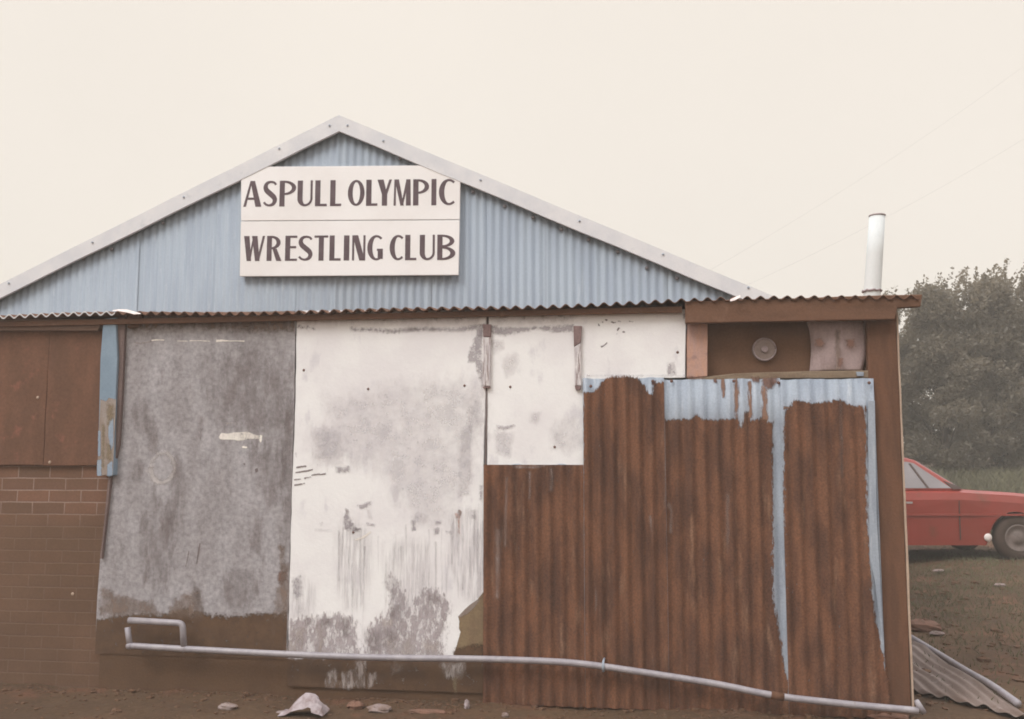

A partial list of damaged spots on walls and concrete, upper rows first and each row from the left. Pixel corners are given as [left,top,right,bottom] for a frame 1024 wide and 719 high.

water stain [354,325,573,379]
corrosion [483,375,892,718]